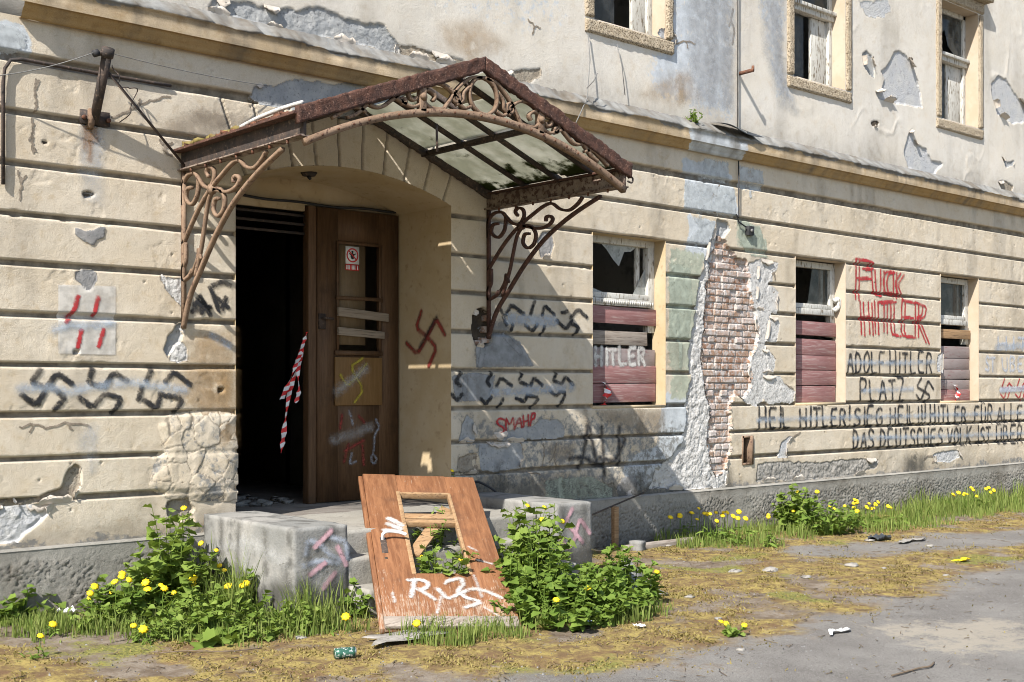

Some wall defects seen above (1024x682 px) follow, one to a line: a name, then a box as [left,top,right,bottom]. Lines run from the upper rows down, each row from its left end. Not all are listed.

flaking render [208,0,463,65]
flaking render [248,78,367,110]
peeling [862,51,922,107]
peeling [991,76,1024,124]
peeling [904,130,942,174]
flaking render [160,274,181,306]
flaking render [164,323,188,363]
flaking render [617,219,796,496]
flaking render [457,414,565,474]
flaking render [756,436,879,483]
flaking render [0,464,81,544]